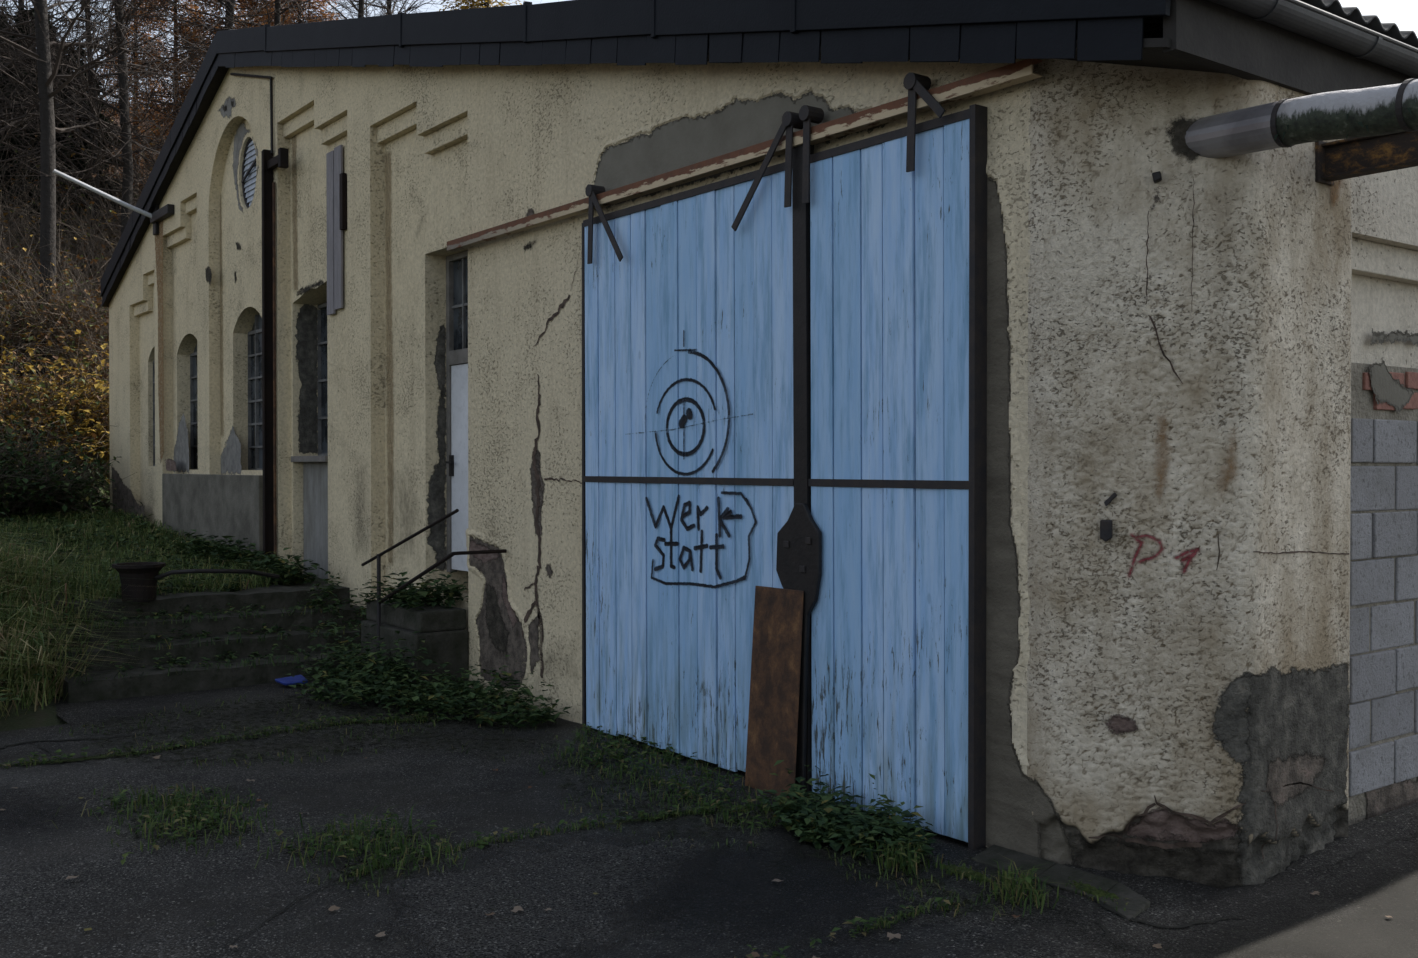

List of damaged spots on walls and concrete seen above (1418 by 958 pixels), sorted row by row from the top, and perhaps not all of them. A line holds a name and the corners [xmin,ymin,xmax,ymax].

flaking render [590,80,891,209]
spalling [295,280,324,454]
spalling [1370,328,1418,346]
spalling [426,325,447,570]
spalling [530,449,545,536]
crack [522,256,582,678]
flaking render [986,158,1073,865]
spalling [465,528,540,697]
crack [0,711,522,769]
spalling [1105,714,1138,735]
peeling [1266,751,1326,808]